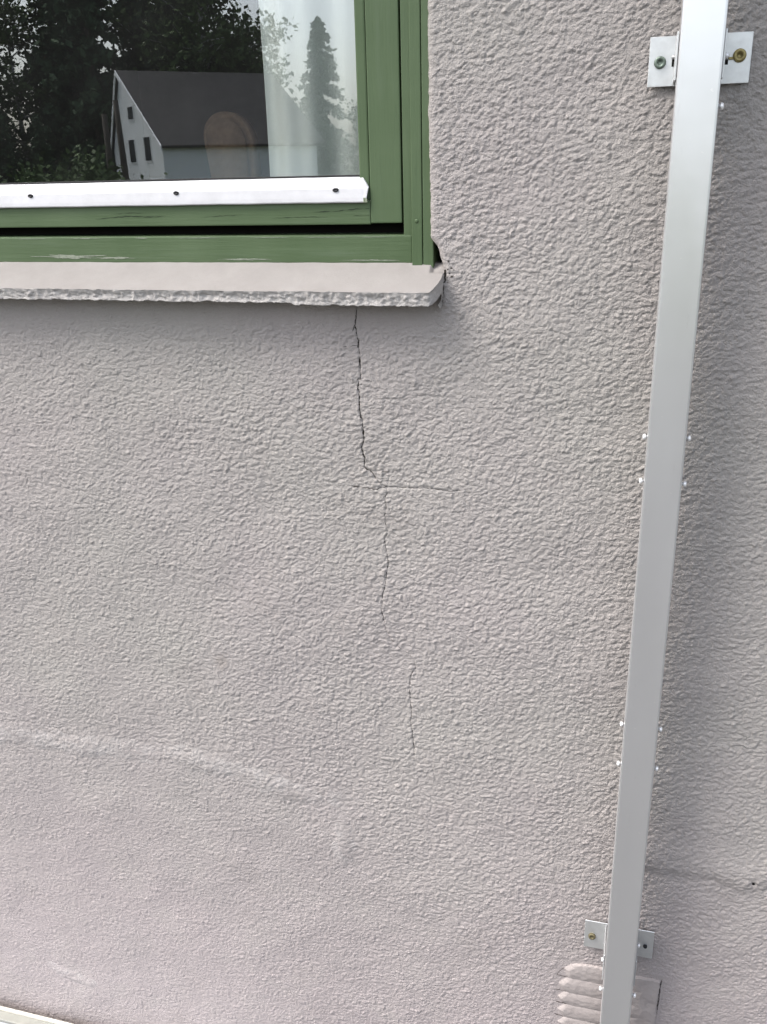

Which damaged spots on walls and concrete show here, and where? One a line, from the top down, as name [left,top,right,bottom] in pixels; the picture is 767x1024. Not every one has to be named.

crack [343,310,467,755]